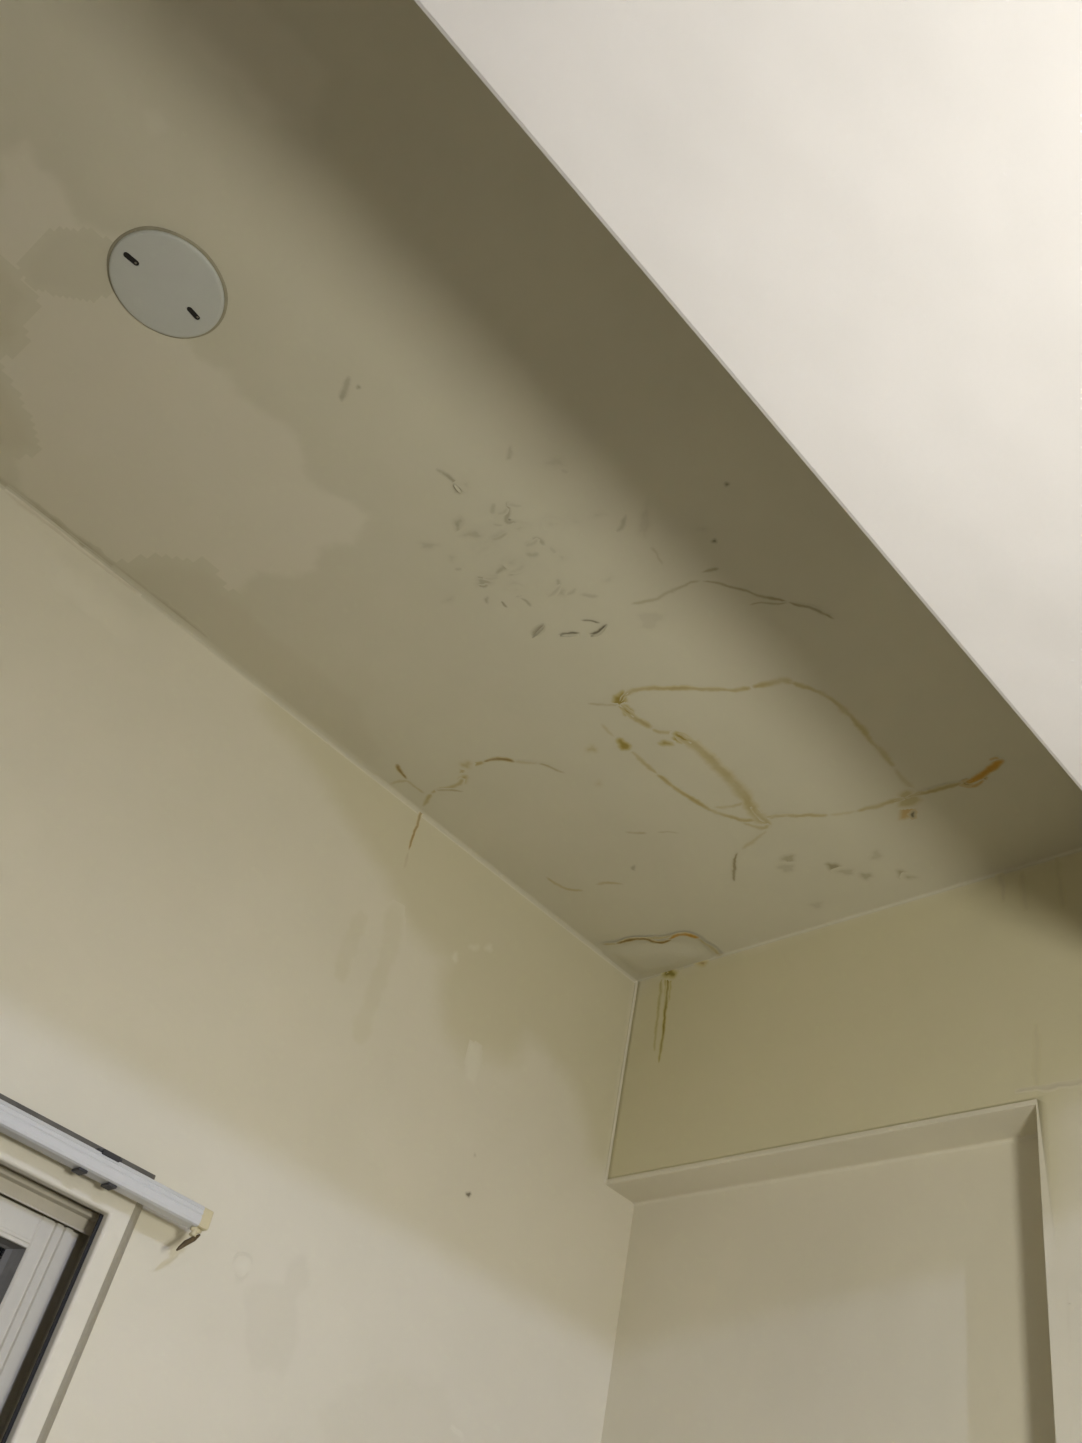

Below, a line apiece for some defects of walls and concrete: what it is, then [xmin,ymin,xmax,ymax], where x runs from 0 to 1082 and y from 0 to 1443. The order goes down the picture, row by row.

leakage [161,0,347,145]
crack [630,546,836,634]
leakage [0,119,1082,1266]
crack [389,675,1007,882]
crack [602,932,725,958]